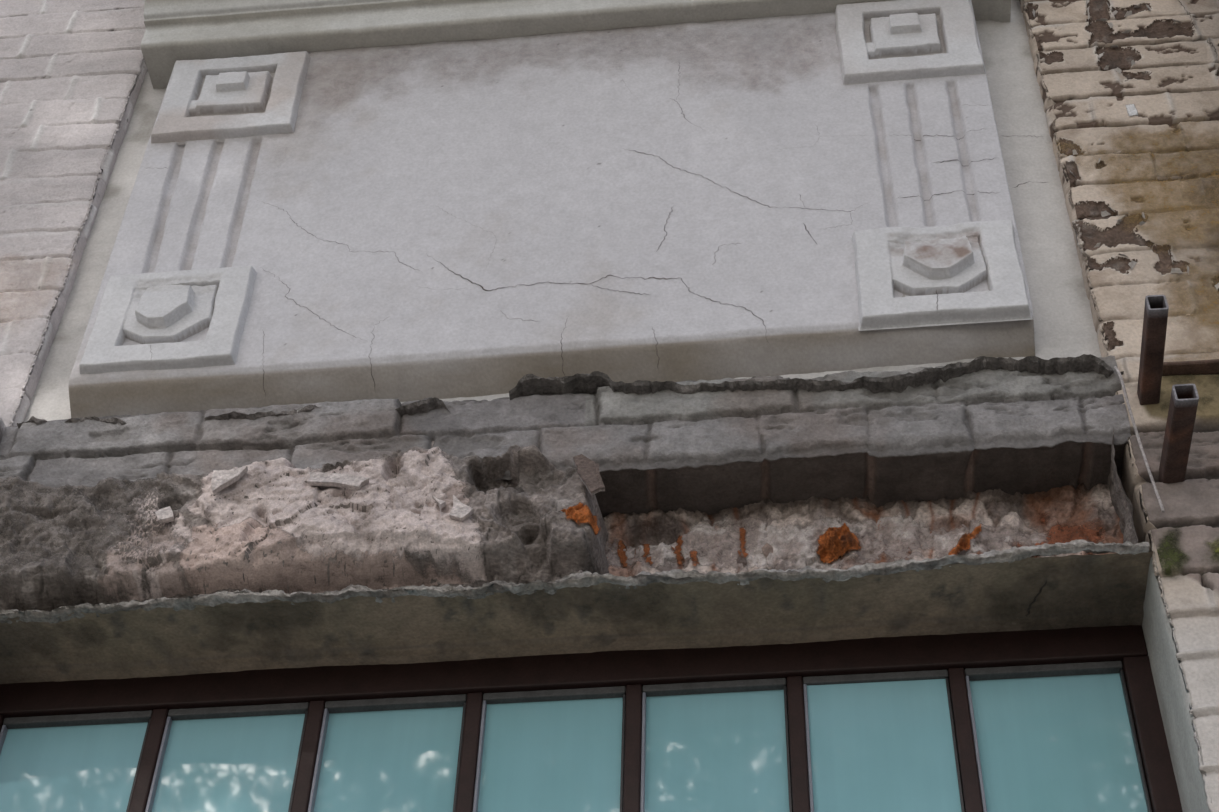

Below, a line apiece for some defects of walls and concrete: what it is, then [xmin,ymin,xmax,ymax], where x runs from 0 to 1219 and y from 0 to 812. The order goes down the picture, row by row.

peeling [1085,0,1195,81]
crack [630,150,856,244]
crack [898,105,1046,201]
peeling [1060,138,1086,187]
crack [278,208,765,326]
peeling [1075,201,1190,275]
peeling [1103,321,1123,349]
spalling [0,447,487,603]
corrosion [561,502,600,535]
corrosion [816,523,861,563]
corrosion [948,524,982,555]
corrosion [1016,512,1105,558]